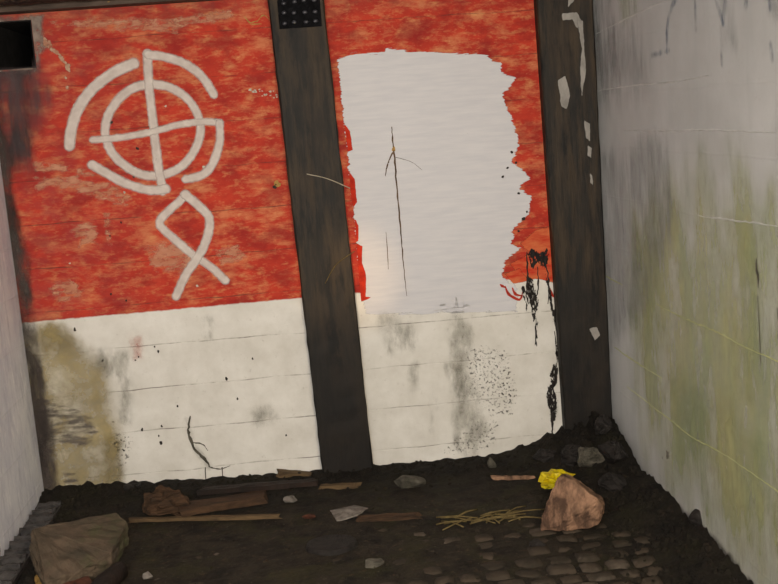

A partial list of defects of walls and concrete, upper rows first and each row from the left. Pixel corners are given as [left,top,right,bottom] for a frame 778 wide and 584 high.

peeling [344,124,353,152]
peeling [349,173,357,207]
water stain [5,195,30,295]
peeling [355,220,371,301]
water stain [26,324,126,490]
water stain [461,349,515,414]
crack [187,416,229,479]